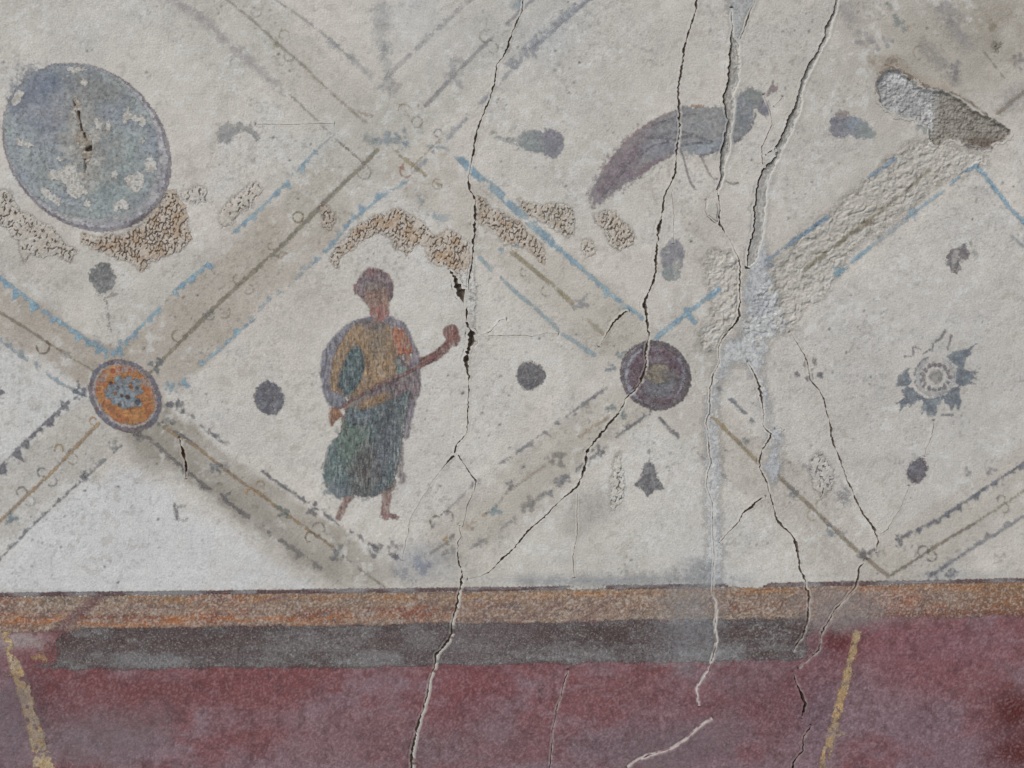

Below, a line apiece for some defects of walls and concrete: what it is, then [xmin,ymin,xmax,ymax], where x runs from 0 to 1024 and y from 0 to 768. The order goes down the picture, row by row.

spalling [0,185,207,272]
spalling [217,180,263,228]
spalling [327,208,478,329]
spalling [478,195,637,265]
spalling [695,65,1013,353]
crack [399,0,882,768]